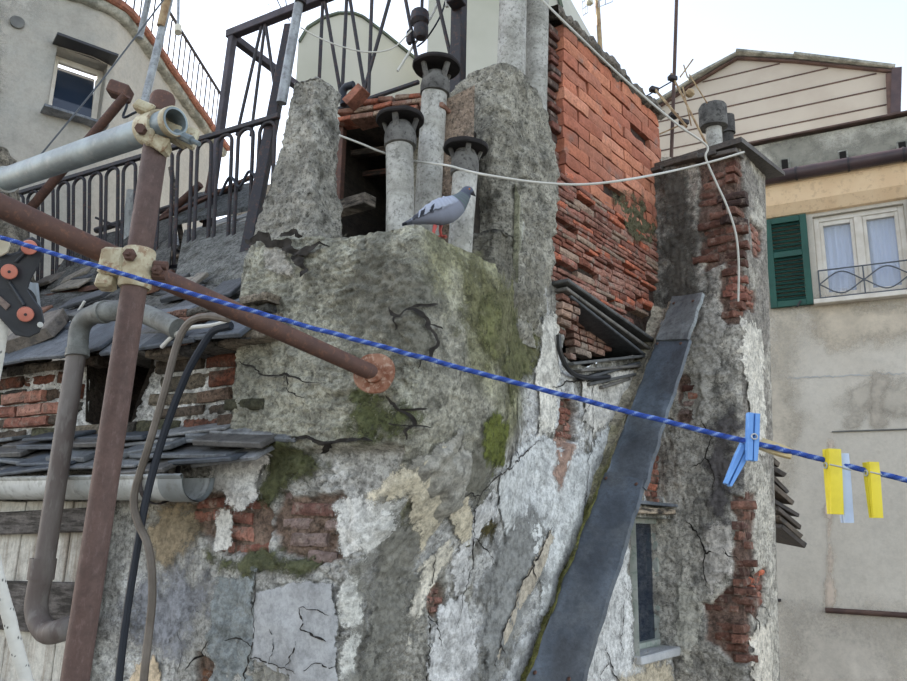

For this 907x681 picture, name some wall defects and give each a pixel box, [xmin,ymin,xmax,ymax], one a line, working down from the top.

crack [388,303,443,368]
flaking render [692,160,767,456]
peeling [194,445,272,555]
crack [177,569,338,680]
peeling [283,312,634,681]
flaking render [705,491,773,681]